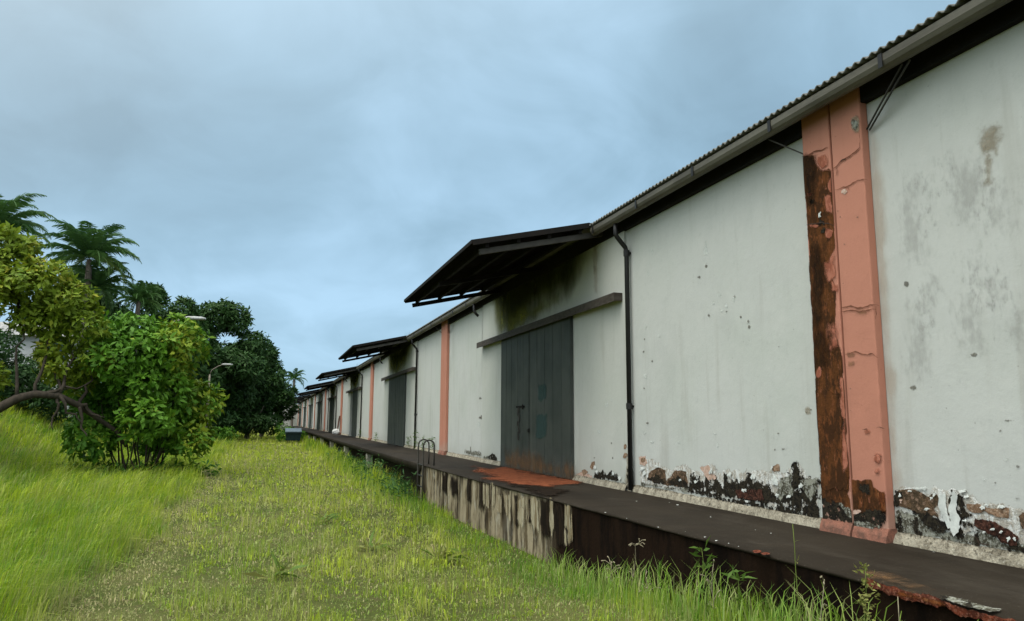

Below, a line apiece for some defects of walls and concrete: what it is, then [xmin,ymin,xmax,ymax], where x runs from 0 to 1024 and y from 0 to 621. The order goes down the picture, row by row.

crack [804,143,867,194]
water stain [981,128,997,182]
corrosion [803,155,886,513]
crack [842,304,879,319]
water stain [442,447,573,549]
peeling [639,456,822,516]
peeling [893,486,1024,546]